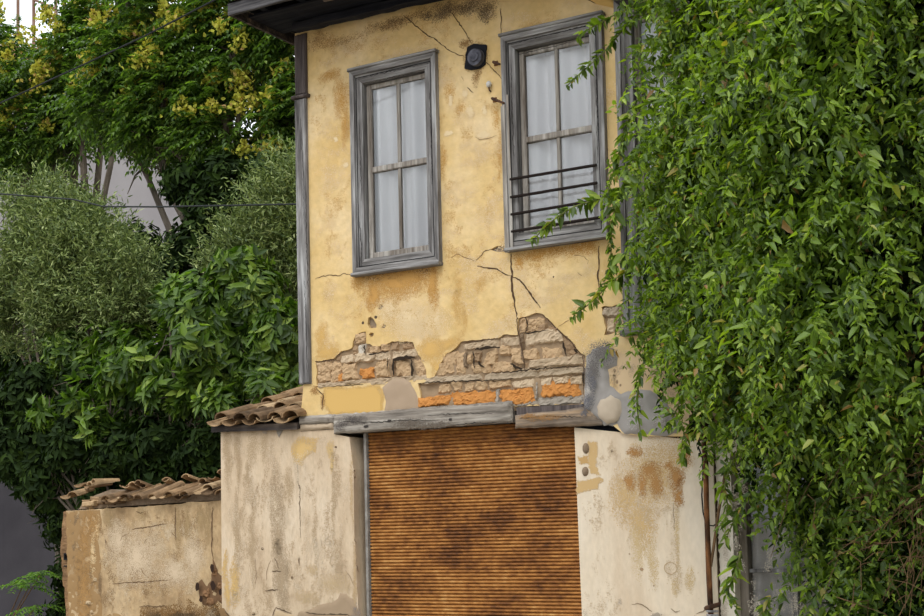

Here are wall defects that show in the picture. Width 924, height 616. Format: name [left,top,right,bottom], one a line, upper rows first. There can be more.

crack [403,7,472,92]
spalling [316,306,586,411]
crack [453,249,581,354]
spalling [602,304,623,335]
damp [70,502,212,616]
damp [139,432,268,616]
spalling [195,560,229,616]
damp [269,448,358,613]
spalling [298,593,361,616]
damp [671,500,696,601]